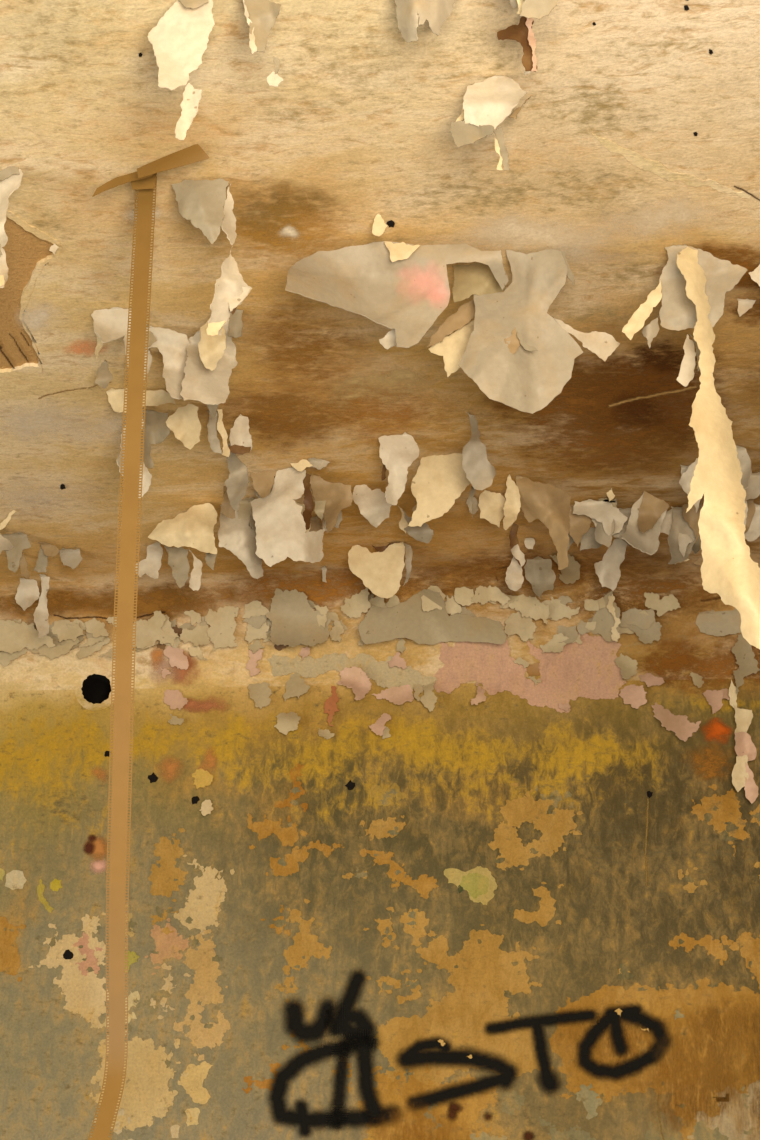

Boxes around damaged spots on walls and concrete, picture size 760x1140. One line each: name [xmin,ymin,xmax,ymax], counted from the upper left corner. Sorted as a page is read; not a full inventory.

peeling [147,0,215,141]
leakage [698,245,760,322]
leakage [495,345,717,469]
peeling [0,510,117,711]
leakage [32,591,91,613]
leakage [134,584,214,619]
leakage [249,569,371,605]
peeling [132,178,760,857]
leakage [426,552,719,613]
flaking render [0,912,109,1123]
flaking render [109,828,235,1140]
flaking render [342,782,760,1140]